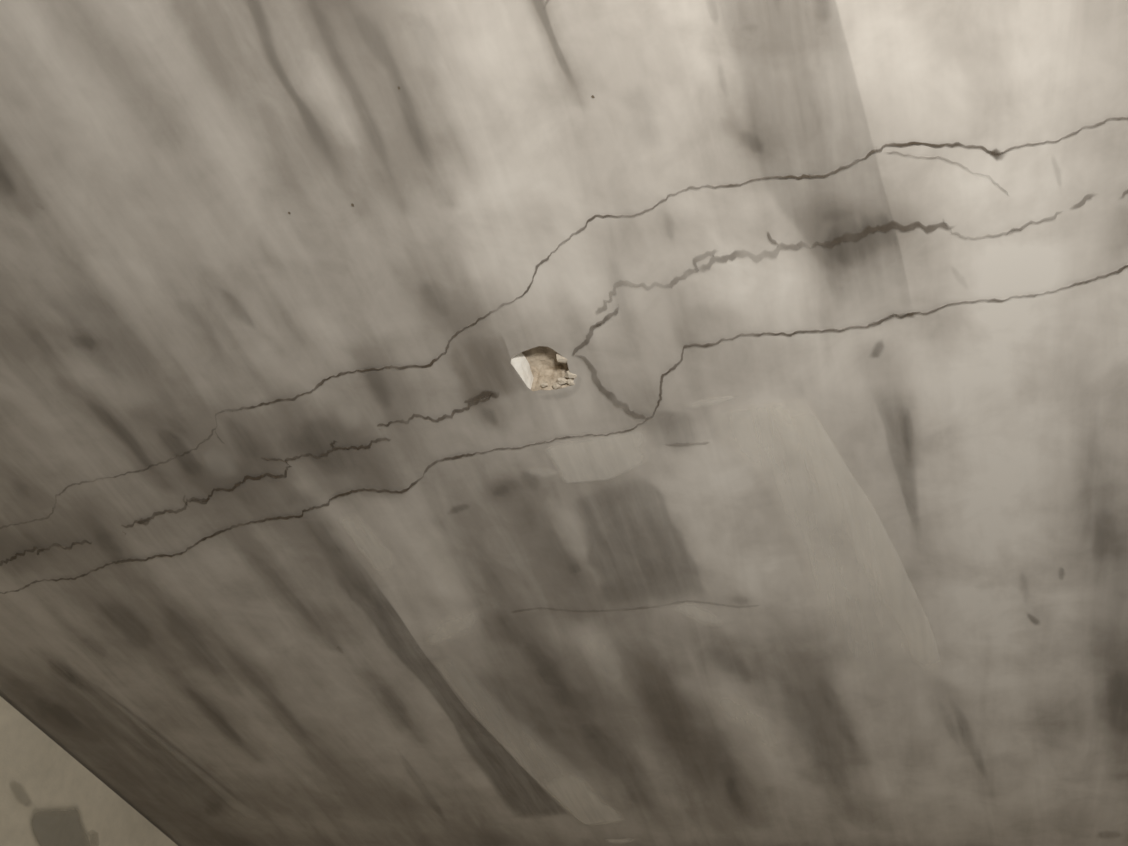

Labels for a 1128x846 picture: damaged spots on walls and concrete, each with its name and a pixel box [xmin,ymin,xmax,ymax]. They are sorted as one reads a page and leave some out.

crack [714,117,1128,188]
crack [579,215,619,231]
crack [833,222,948,245]
crack [516,254,551,299]
crack [1070,265,1128,287]
crack [578,316,609,348]
crack [754,294,1037,336]
crack [248,313,489,409]
spalling [511,346,577,391]
crack [656,339,723,407]
crack [201,391,496,504]
crack [10,427,635,592]